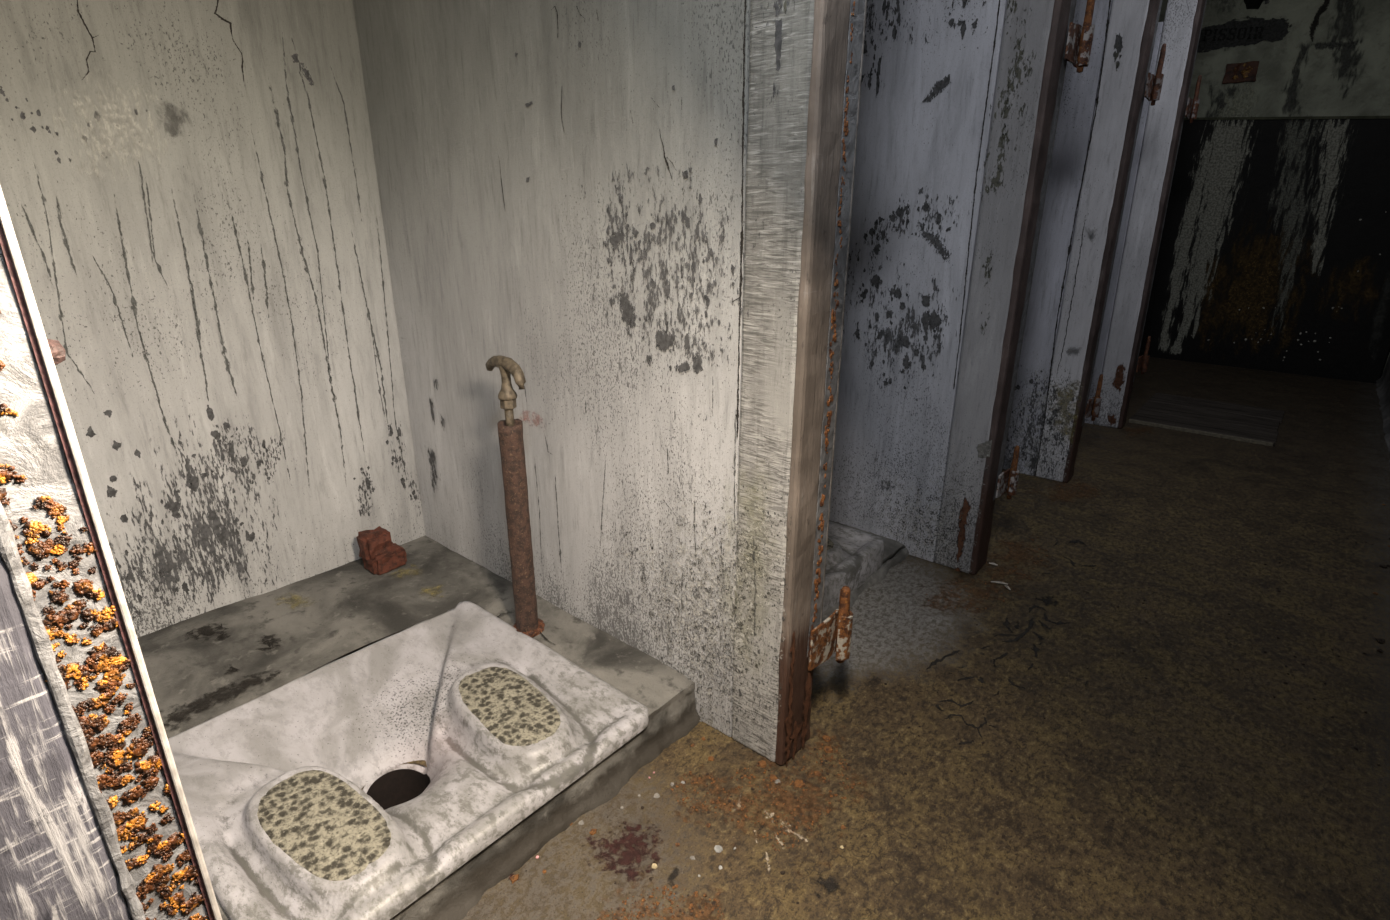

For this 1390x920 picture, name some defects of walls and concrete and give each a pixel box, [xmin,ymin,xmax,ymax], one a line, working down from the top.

crack [77,0,97,80]
crack [214,0,244,81]
crack [291,54,314,86]
spalling [1244,0,1269,9]
rust [812,1,855,622]
rust [0,403,19,417]
rust [955,498,971,572]
rust [0,464,207,920]